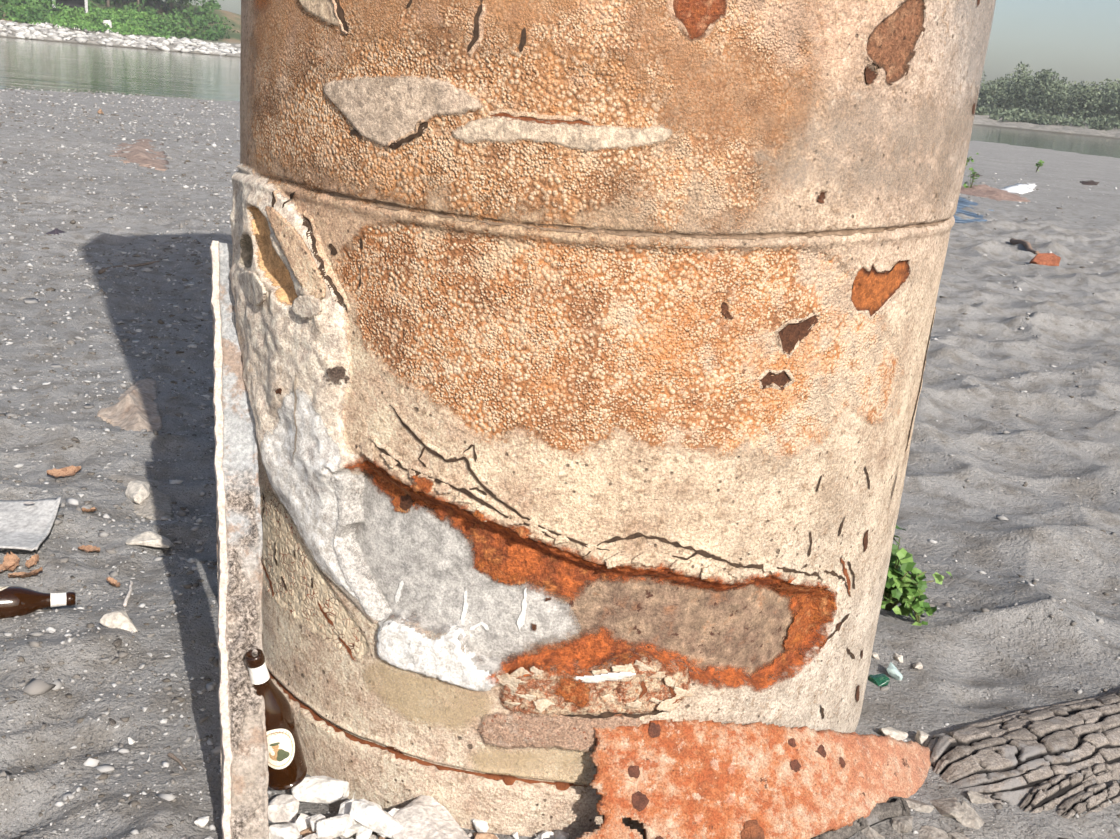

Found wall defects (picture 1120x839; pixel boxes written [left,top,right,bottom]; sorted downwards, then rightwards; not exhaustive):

crack [467,0,487,55]
crack [518,28,526,52]
peeling [324,76,673,151]
rust [247,0,904,460]
crack [370,402,855,659]
peeling [331,439,694,753]
rust [345,457,837,691]
peeling [701,565,747,579]
peeling [762,558,845,594]